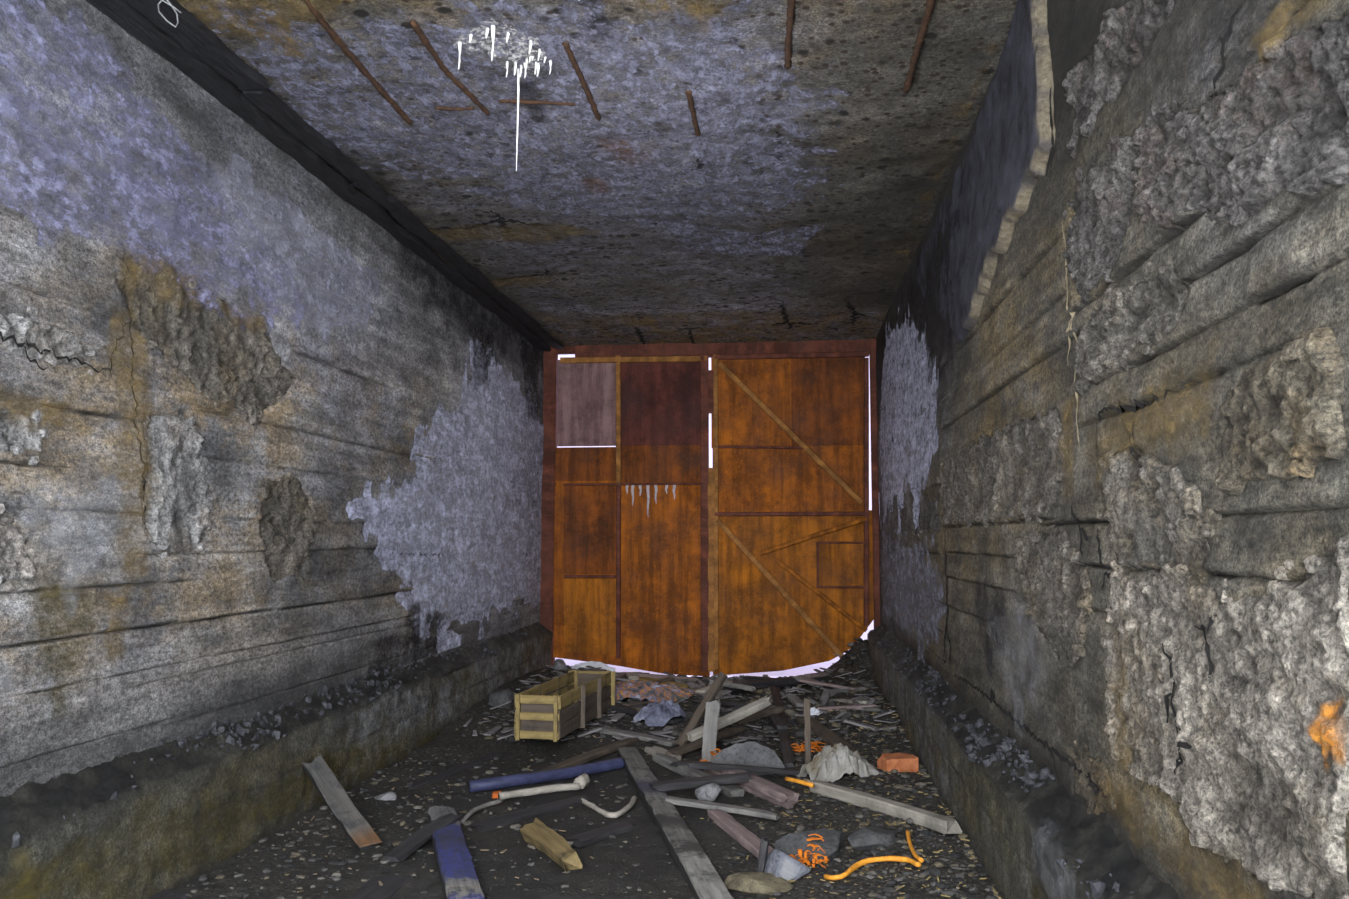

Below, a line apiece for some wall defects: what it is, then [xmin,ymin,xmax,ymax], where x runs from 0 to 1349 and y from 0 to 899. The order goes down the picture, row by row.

water stain [454,19,552,171]
peeling [211,0,849,257]
spalling [0,409,50,466]
spalling [0,503,38,585]
water stain [368,605,450,673]
crack [1194,606,1218,678]
crack [1162,644,1192,773]